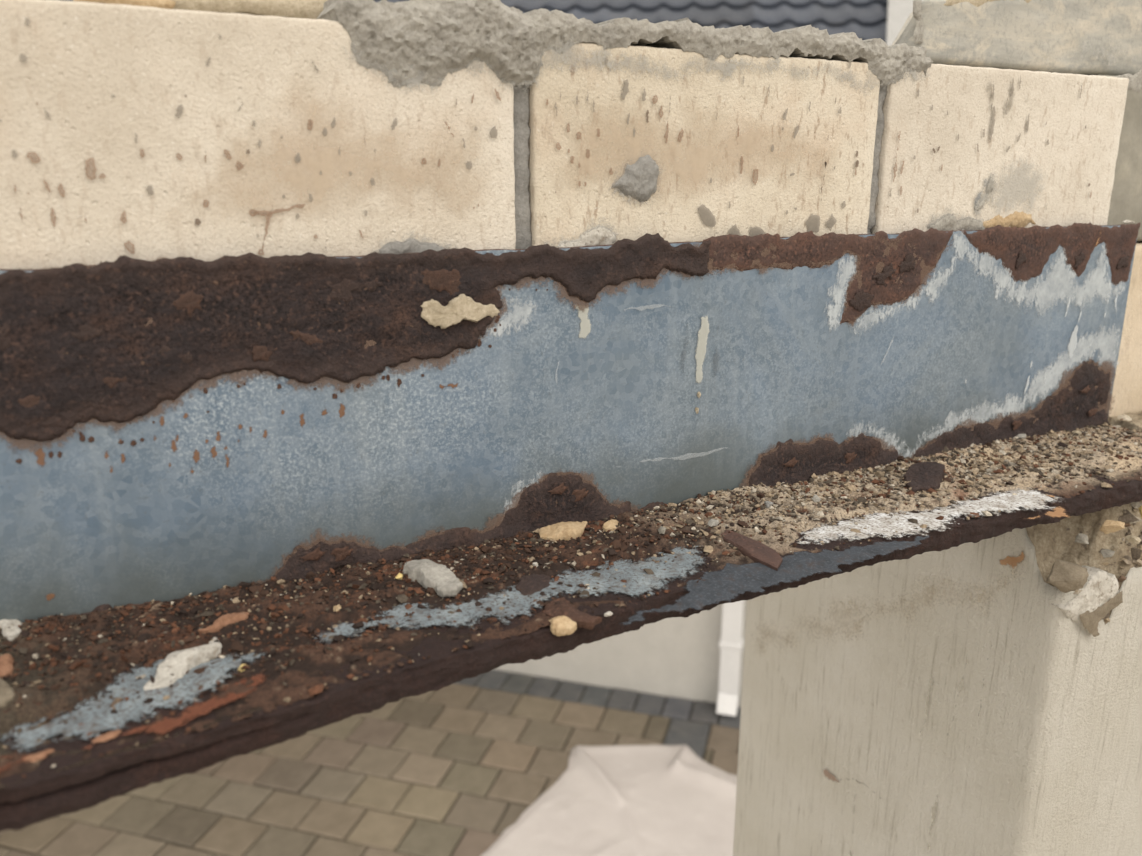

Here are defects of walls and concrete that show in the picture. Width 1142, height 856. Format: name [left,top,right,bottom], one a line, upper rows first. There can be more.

corrosion [0,222,1140,488]
corrosion [1029,495,1069,519]
corrosion [256,471,664,584]
peeling [314,488,1064,644]
corrosion [1000,552,1024,568]
corrosion [515,574,551,596]
peeling [0,619,23,641]
corrosion [198,612,249,634]
corrosion [543,597,602,630]
corrosion [0,653,14,679]
corrosion [82,674,264,749]
corrosion [0,749,55,771]